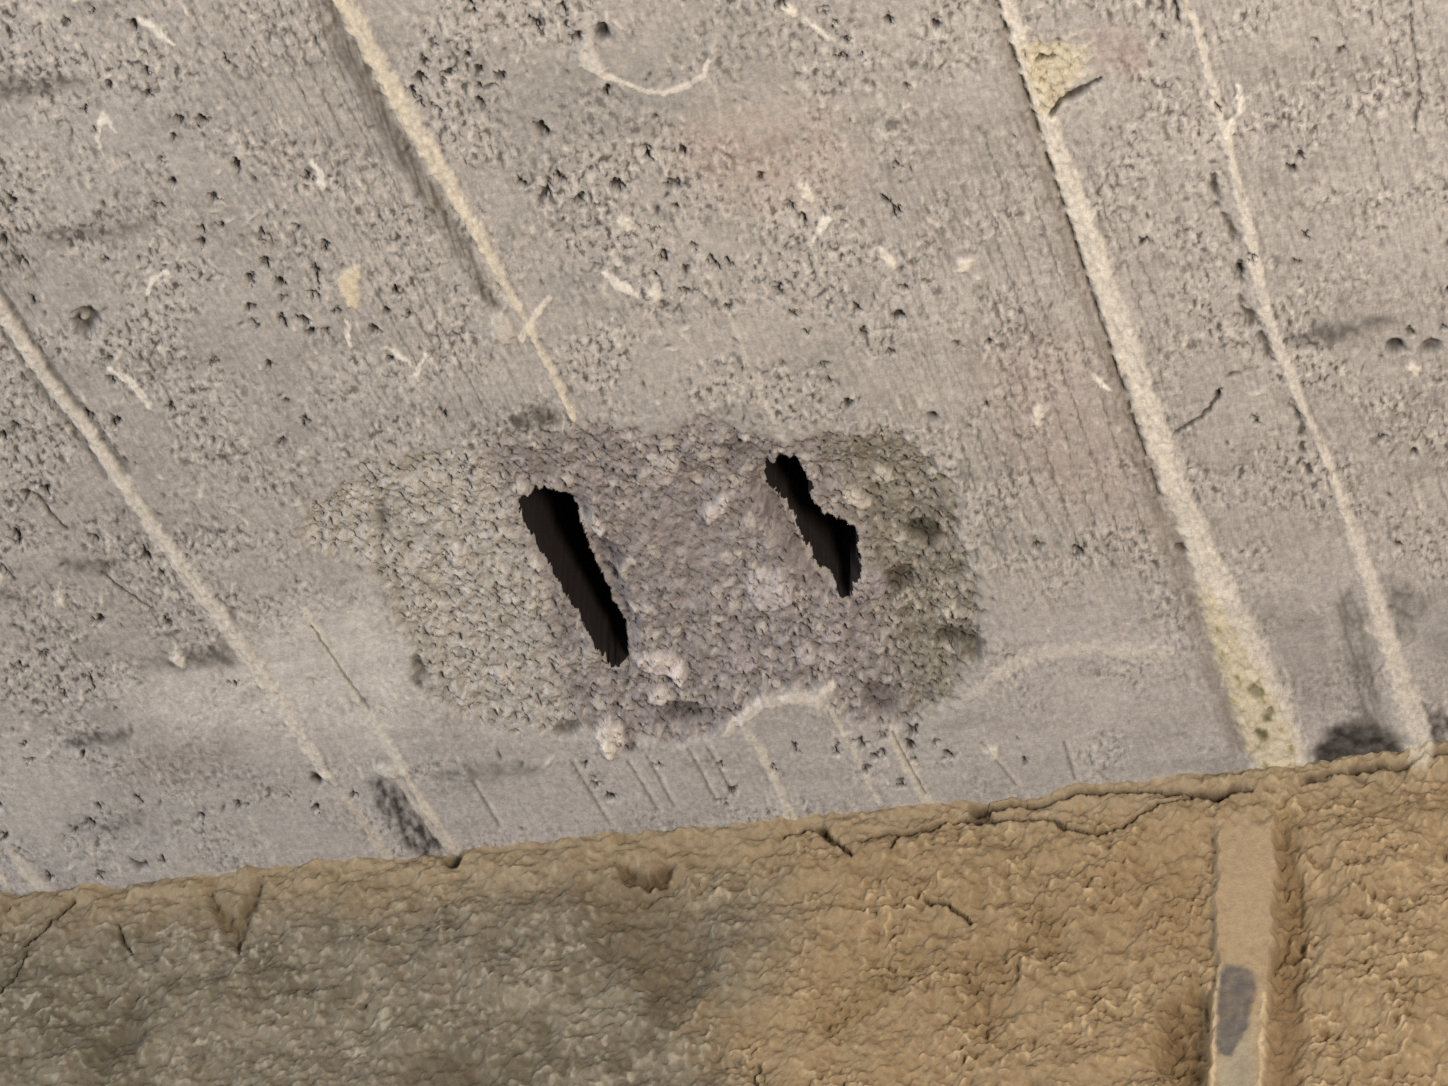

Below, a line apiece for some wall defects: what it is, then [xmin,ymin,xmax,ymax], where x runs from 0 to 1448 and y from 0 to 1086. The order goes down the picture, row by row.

spalling [788,200,808,225]
spalling [881,194,904,221]
spalling [773,281,813,337]
spalling [854,303,869,336]
spalling [892,310,907,323]
spalling [819,360,855,412]
spalling [303,414,988,802]
crack [1301,747,1448,786]
crack [784,780,1254,857]
crack [923,891,975,925]
crack [0,896,78,994]
crack [118,923,134,956]